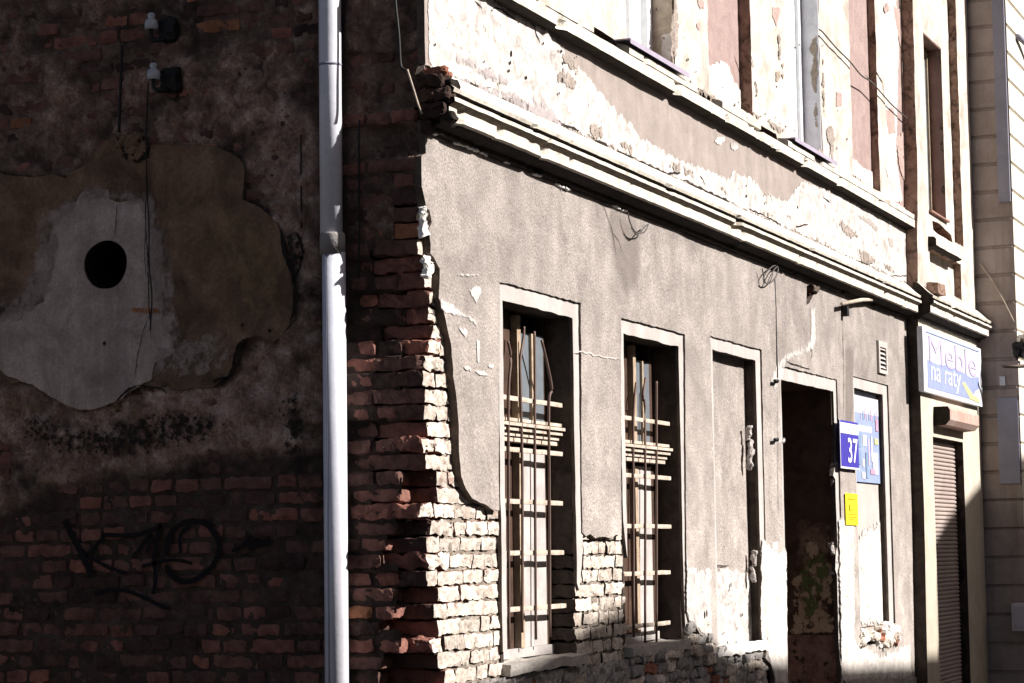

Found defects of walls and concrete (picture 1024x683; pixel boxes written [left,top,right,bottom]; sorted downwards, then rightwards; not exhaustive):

peeling [428,0,907,283]
crack [576,351,621,360]
flaking render [355,189,912,683]